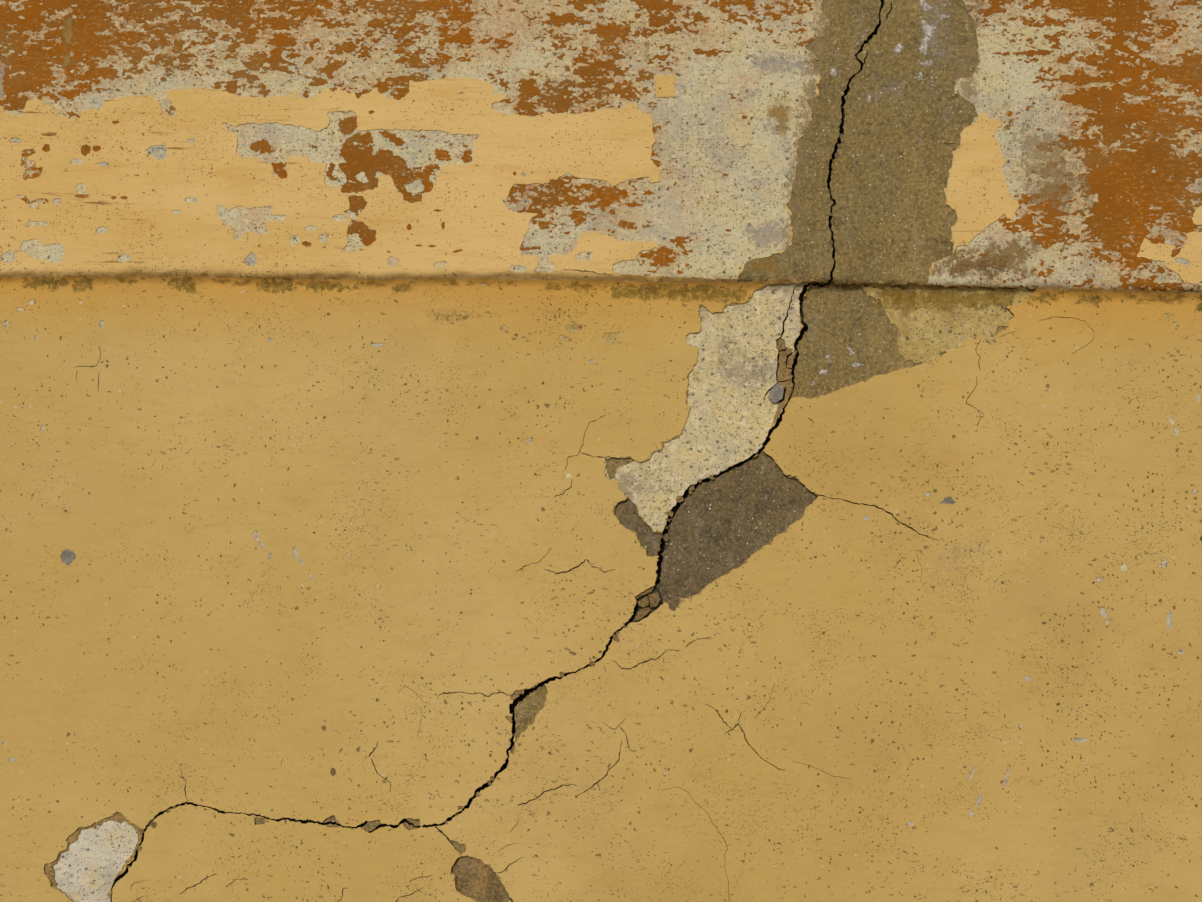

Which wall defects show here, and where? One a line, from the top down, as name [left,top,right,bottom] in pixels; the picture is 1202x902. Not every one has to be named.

peeling [0,0,830,280]
crack [111,0,892,902]
crack [808,490,936,575]
peeling [604,0,1202,622]
flaking render [44,811,142,902]
flaking render [451,840,510,902]